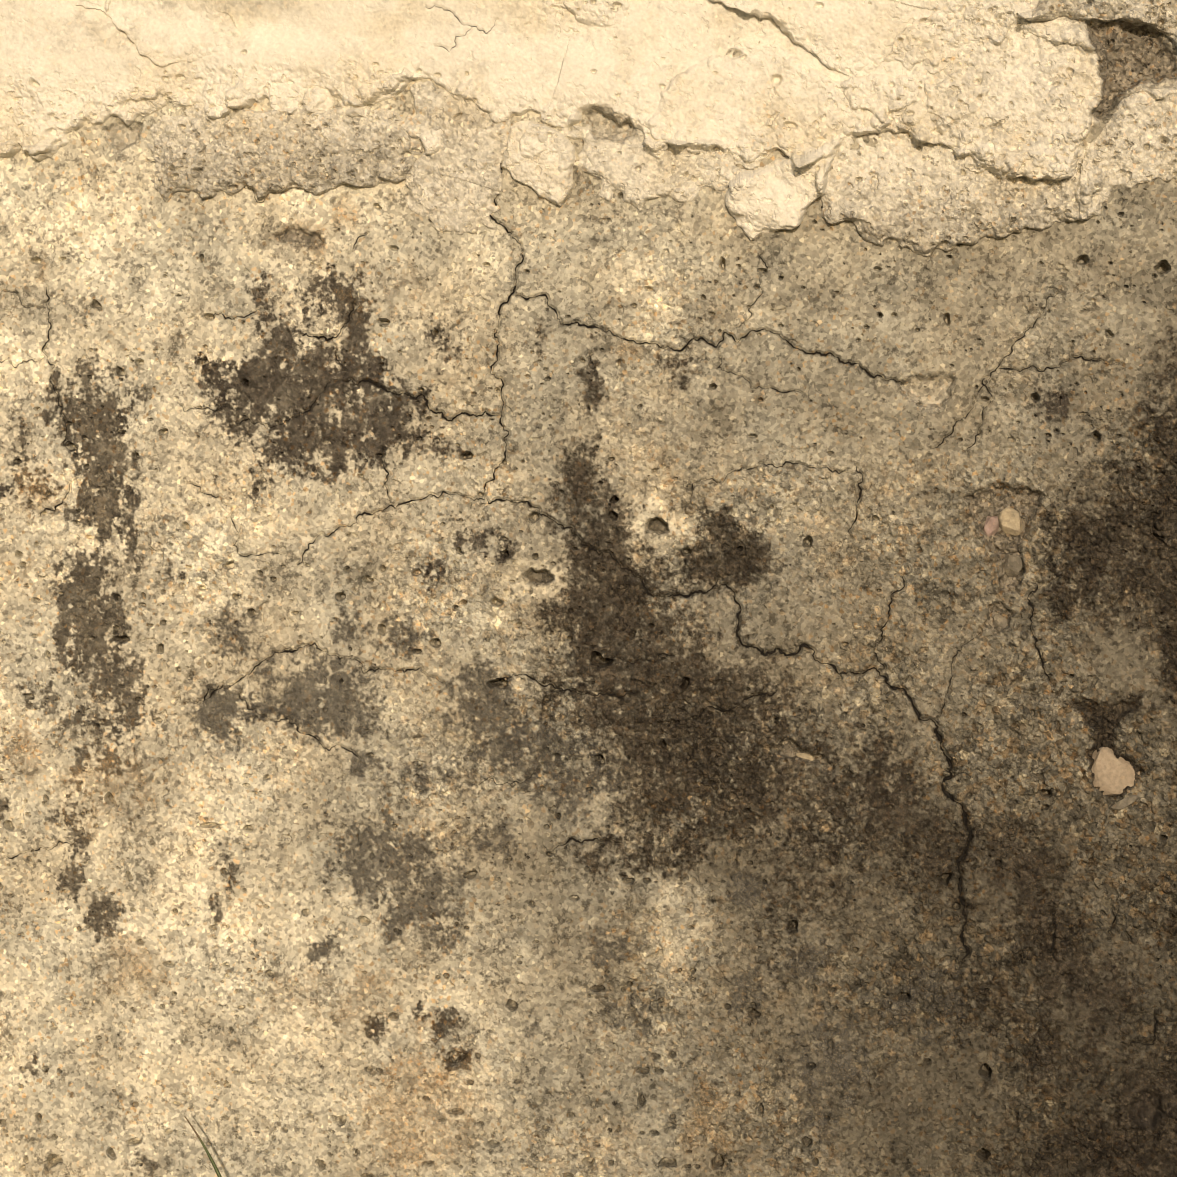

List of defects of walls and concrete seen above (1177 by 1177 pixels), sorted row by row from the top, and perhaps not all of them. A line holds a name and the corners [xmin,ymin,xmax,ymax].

peeling [76,0,243,68]
peeling [0,133,69,161]
spalling [102,0,1177,257]
leakage [194,263,469,501]
leakage [577,356,605,416]
crack [930,294,1120,452]
crack [179,164,980,961]
crack [1027,582,1054,692]
leakage [1035,326,1177,719]
leakage [187,436,1177,1177]
crack [1050,910,1058,962]
leakage [25,1055,49,1082]